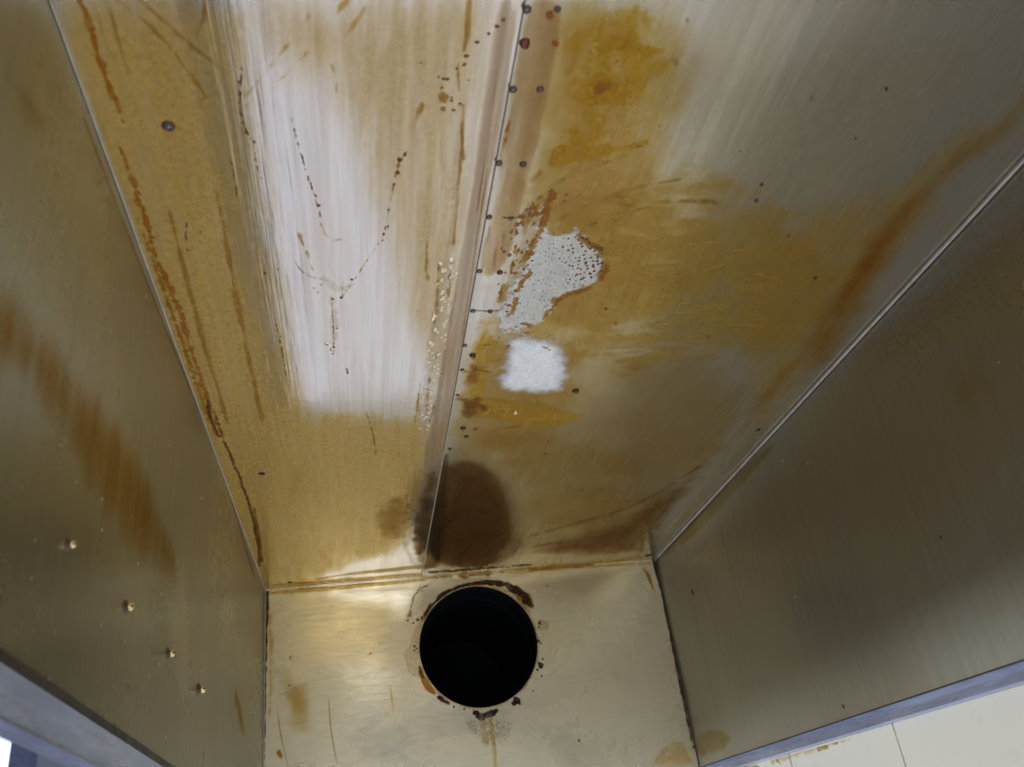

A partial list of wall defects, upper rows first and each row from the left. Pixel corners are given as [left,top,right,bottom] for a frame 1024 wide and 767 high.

peeling [491,188,608,400]